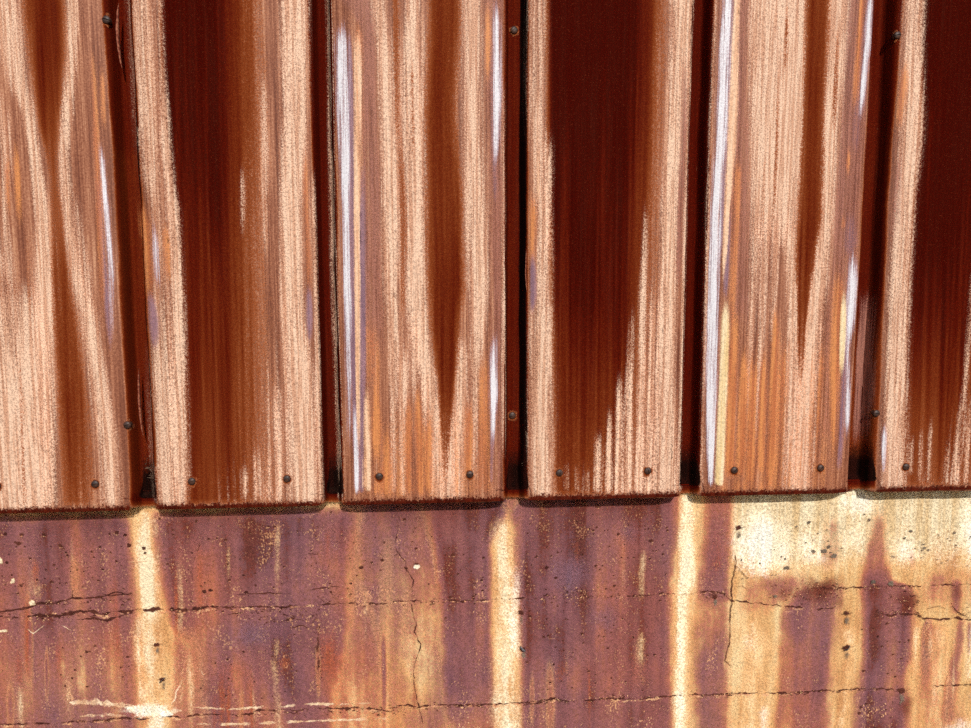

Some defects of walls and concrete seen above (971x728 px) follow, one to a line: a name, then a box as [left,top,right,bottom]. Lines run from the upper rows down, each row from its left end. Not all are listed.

corrosion [0,0,511,728]
corrosion [502,0,877,728]
corrosion [849,0,908,475]
corrosion [877,0,971,492]
crack [0,515,971,728]
corrosion [741,517,971,728]